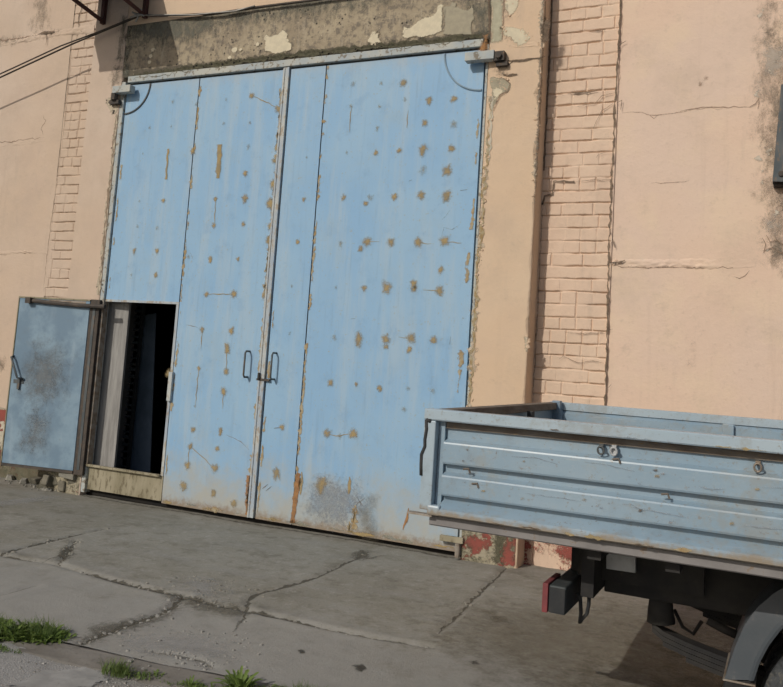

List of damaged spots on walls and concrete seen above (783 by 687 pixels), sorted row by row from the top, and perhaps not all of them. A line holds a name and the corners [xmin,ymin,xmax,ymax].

peeling [256,30,292,54]
peeling [367,31,381,45]
peeling [402,2,474,39]
spalling [488,0,551,202]
crack [499,0,625,406]
leakage [750,47,783,263]
spalling [0,407,80,495]
crack [0,528,507,648]